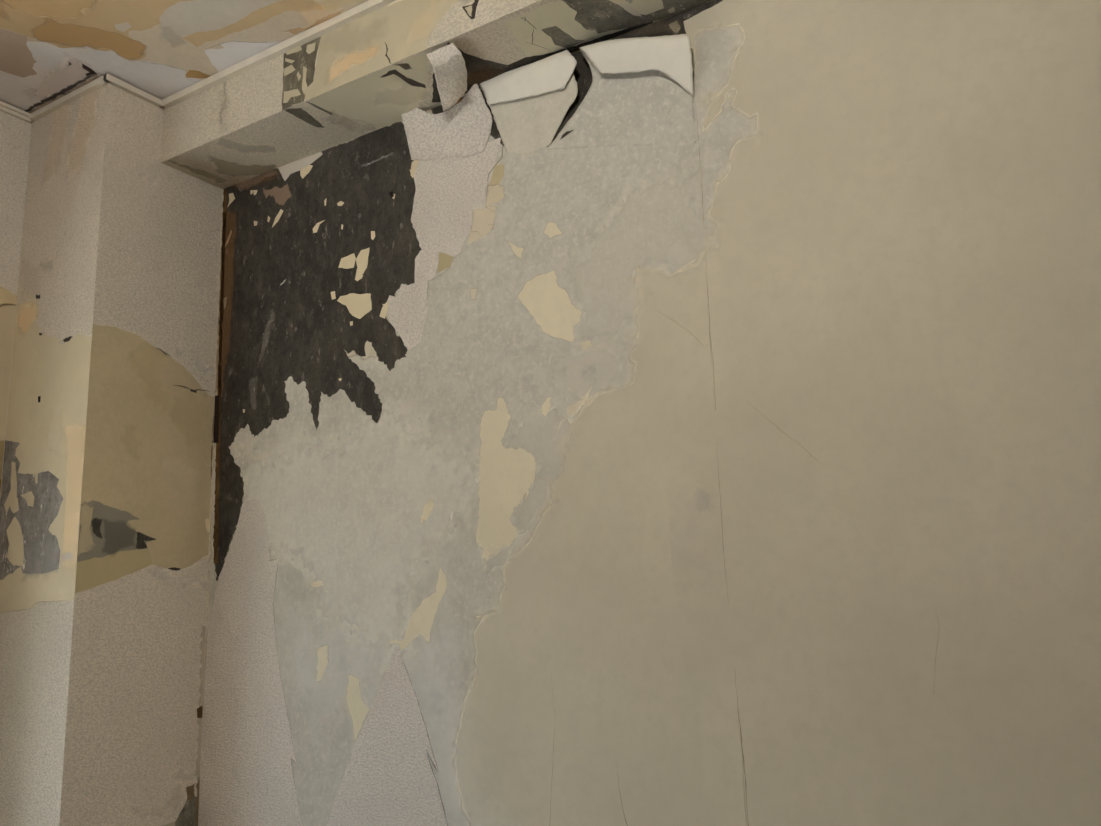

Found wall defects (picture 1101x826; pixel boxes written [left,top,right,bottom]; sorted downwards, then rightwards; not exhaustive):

peeling [282,36,333,128]
peeling [426,0,723,147]
peeling [437,252,454,273]
peeling [213,122,422,581]
flaking render [0,440,155,580]
peeling [163,778,200,826]